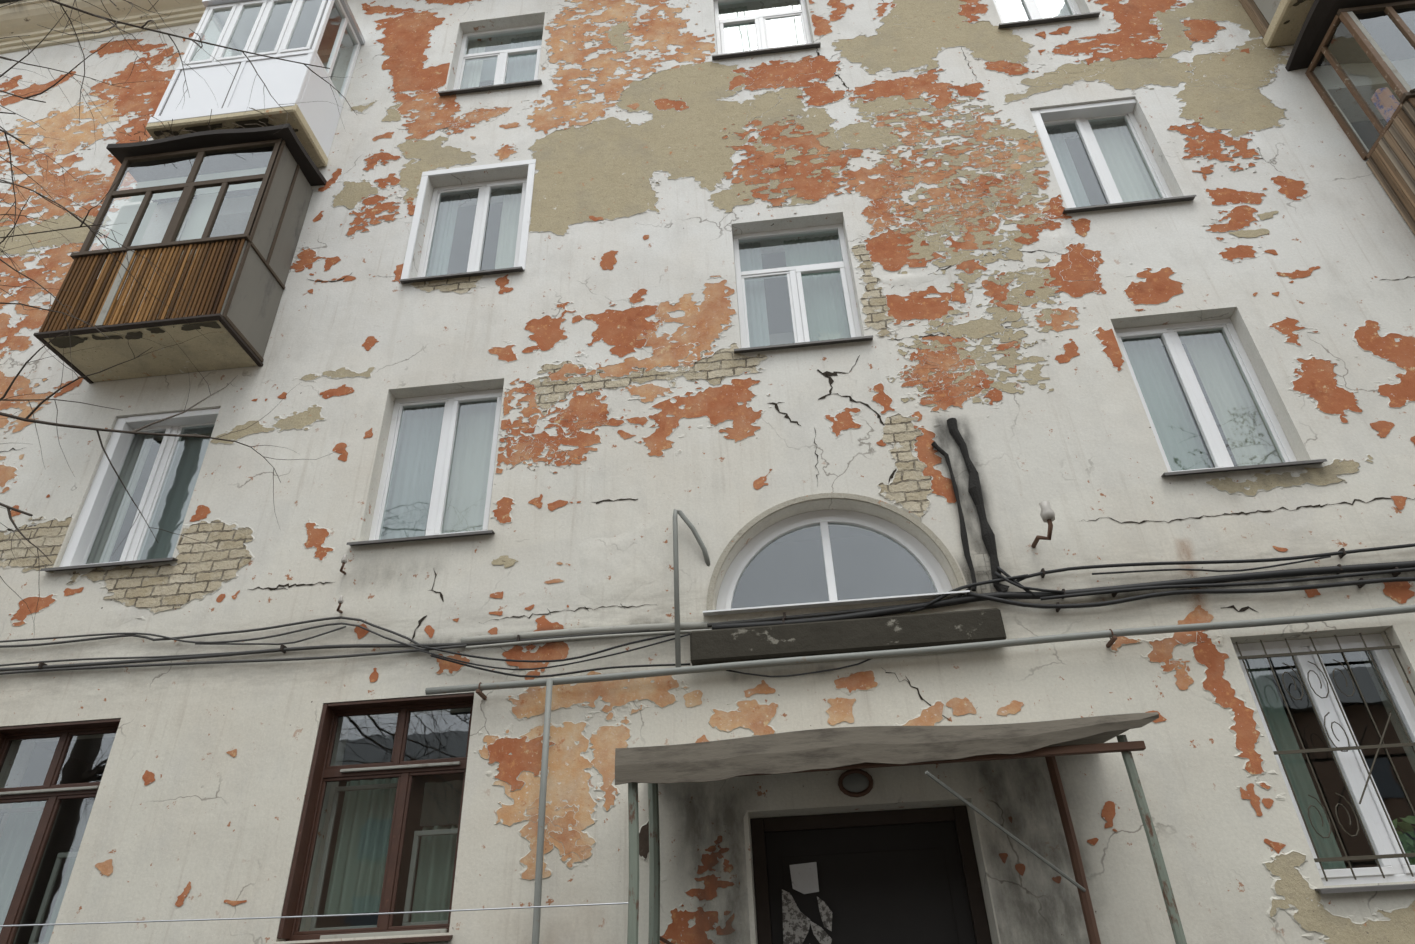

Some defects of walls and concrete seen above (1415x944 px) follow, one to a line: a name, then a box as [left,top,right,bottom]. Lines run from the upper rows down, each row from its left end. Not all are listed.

peeling [290,242,356,294]
flaking render [312,0,1320,525]
peeling [0,32,255,627]
crack [768,333,950,487]
peeling [1268,317,1415,438]
peeling [303,518,335,563]
crack [1081,497,1414,524]
flaking render [1204,454,1374,497]
peeling [473,604,780,883]
peeling [1097,605,1286,816]
peeling [660,824,748,944]
flaking render [1262,839,1415,944]